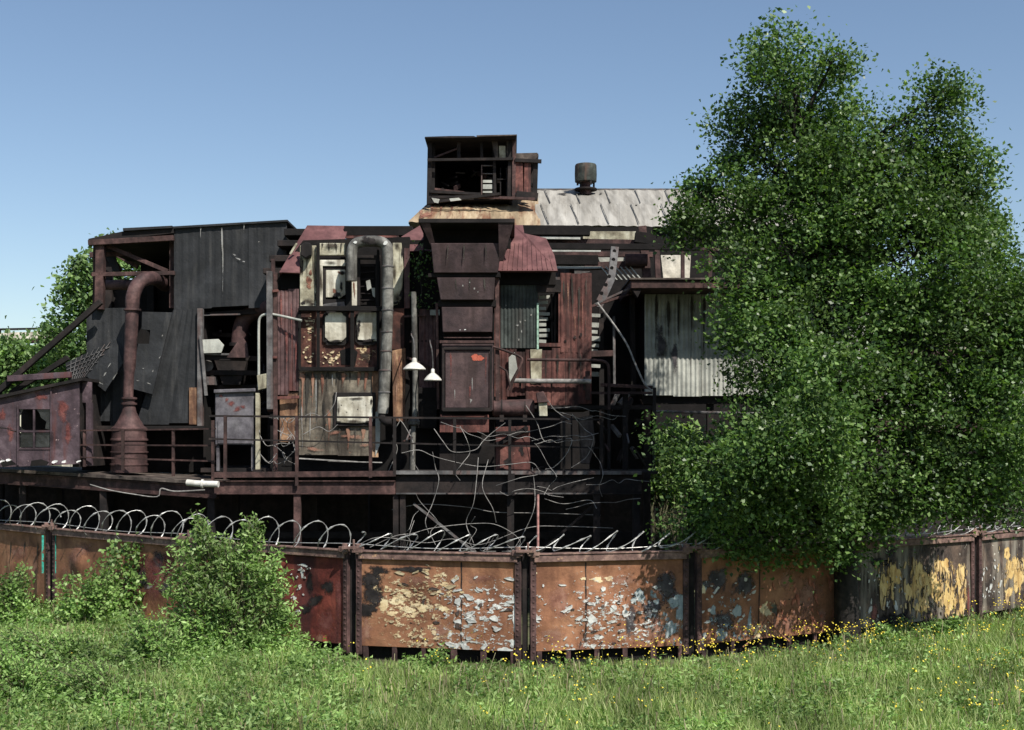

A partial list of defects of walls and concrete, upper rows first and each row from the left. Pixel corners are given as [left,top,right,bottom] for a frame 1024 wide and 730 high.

corrosion [123,550,178,605]
peeling [369,564,515,651]
peeling [536,569,683,651]
peeling [702,572,834,644]
peeling [865,555,968,624]
peeling [982,546,1024,605]